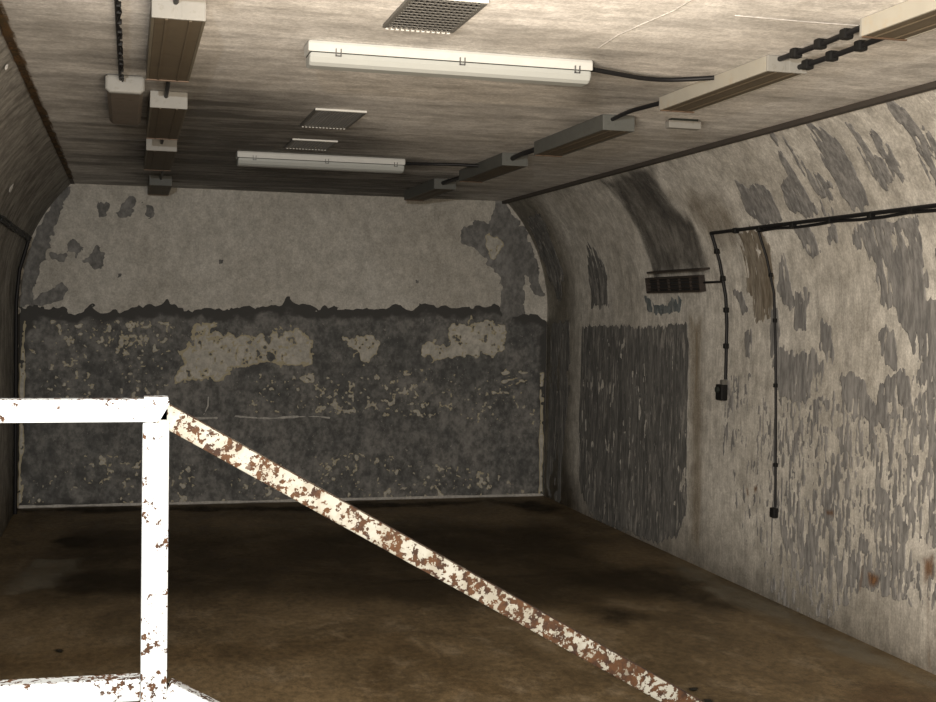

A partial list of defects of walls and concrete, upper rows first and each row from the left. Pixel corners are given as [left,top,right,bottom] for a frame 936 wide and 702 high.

peeling [886,101,936,186]
peeling [17,187,689,544]
peeling [723,122,936,619]